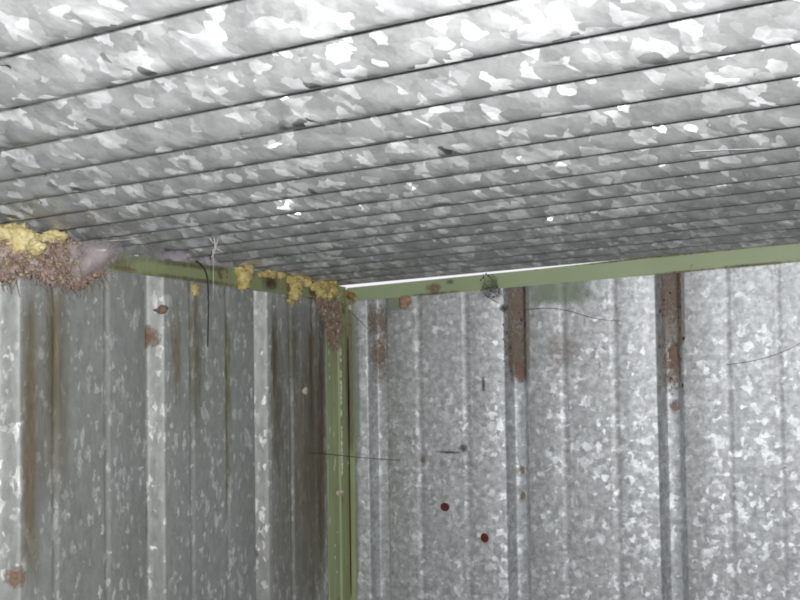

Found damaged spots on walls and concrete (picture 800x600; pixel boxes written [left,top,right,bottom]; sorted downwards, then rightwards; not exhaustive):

rust [368,309,387,383]
rust [502,286,530,381]
rust [658,271,689,411]
rust [5,569,24,587]